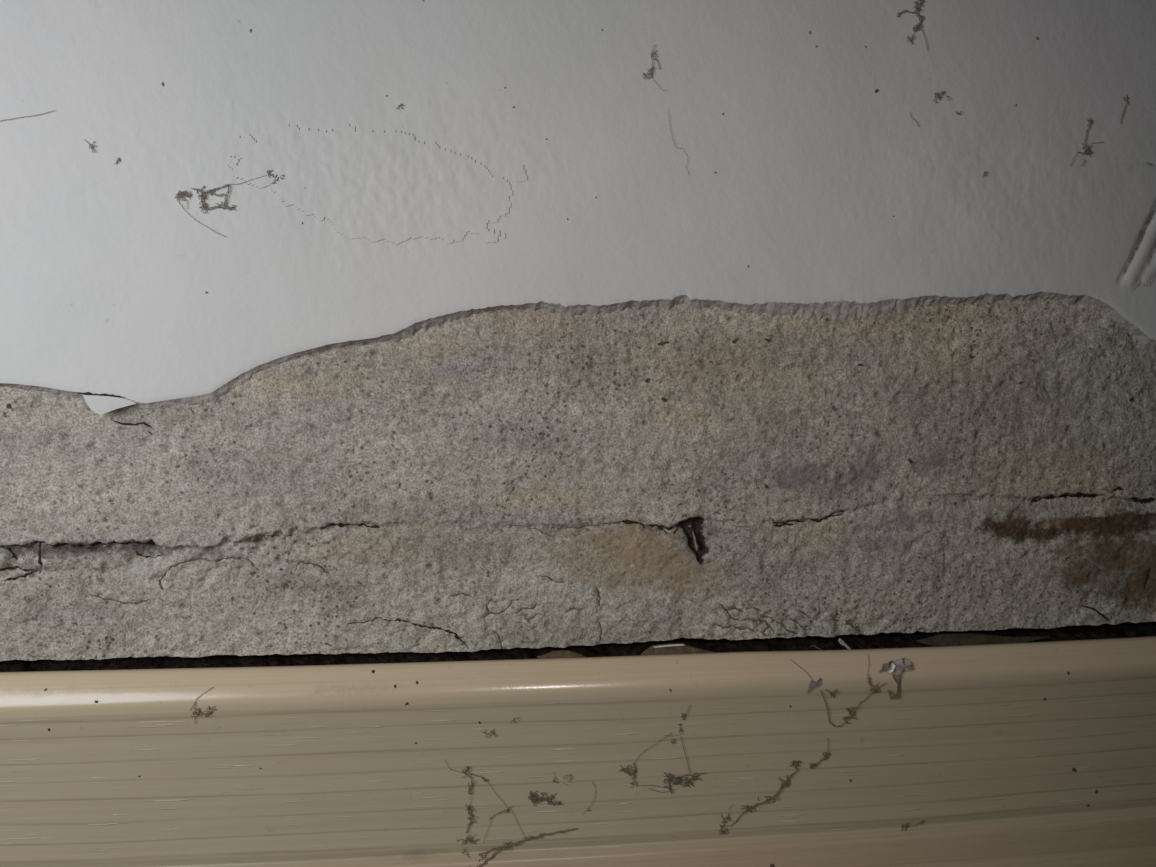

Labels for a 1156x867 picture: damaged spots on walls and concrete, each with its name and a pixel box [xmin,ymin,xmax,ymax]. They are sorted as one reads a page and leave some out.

peeling [0,292,1156,662]
crack [1004,487,1154,504]
crack [321,522,379,530]
crack [733,501,875,528]
crack [0,535,280,604]
crack [294,561,329,573]